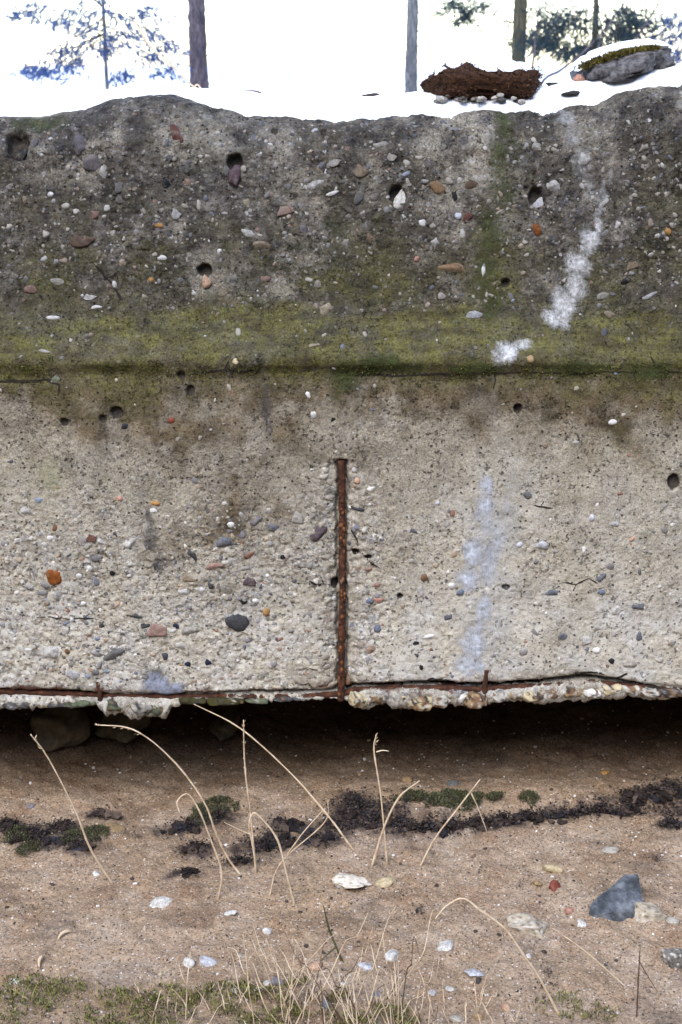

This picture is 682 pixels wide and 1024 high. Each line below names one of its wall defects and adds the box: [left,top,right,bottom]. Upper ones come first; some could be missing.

leakage [546,223,600,325]
leakage [501,342,528,361]
spalling [175,463,682,711]
rust [6,685,125,699]
rust [334,669,400,704]
spalling [2,697,32,710]
spalling [47,697,163,719]